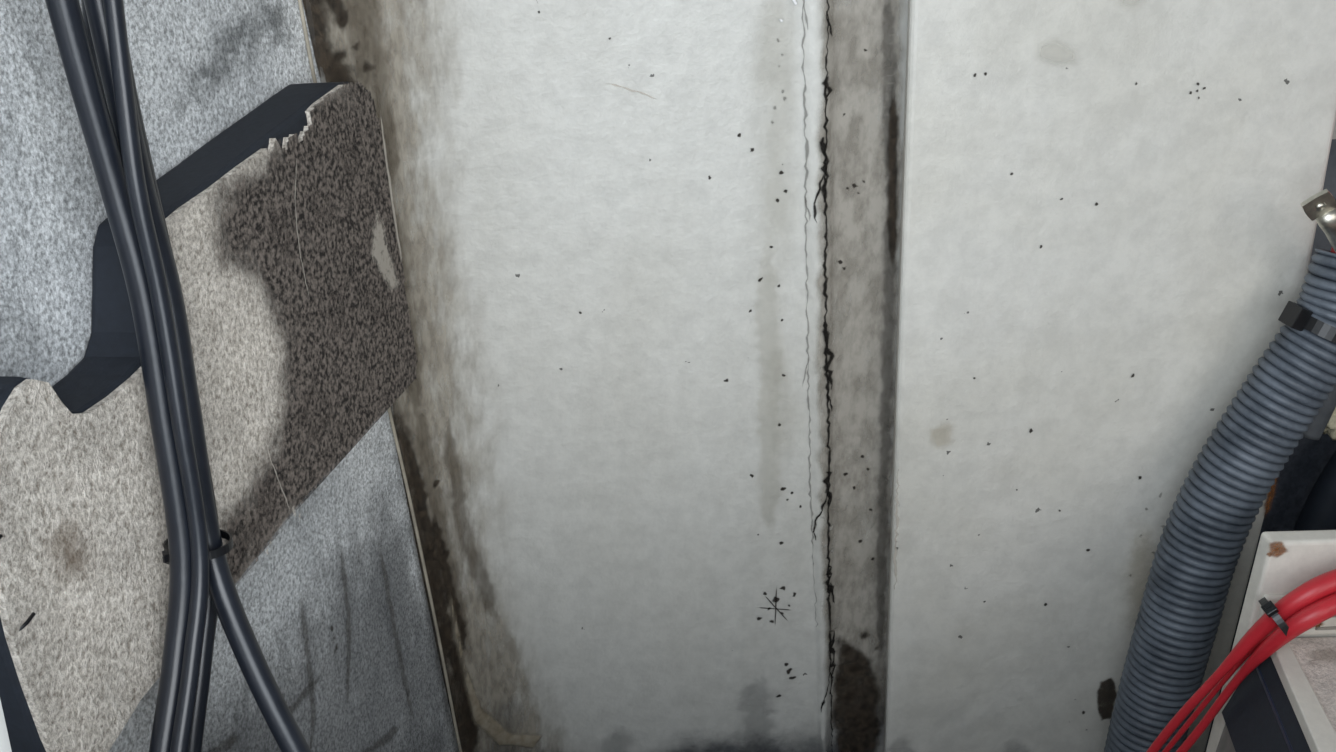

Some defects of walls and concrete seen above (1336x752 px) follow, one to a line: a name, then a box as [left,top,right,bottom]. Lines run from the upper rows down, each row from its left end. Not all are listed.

leakage [218,0,538,752]
leakage [757,586,796,623]
crack [813,0,836,747]
leakage [805,0,902,752]